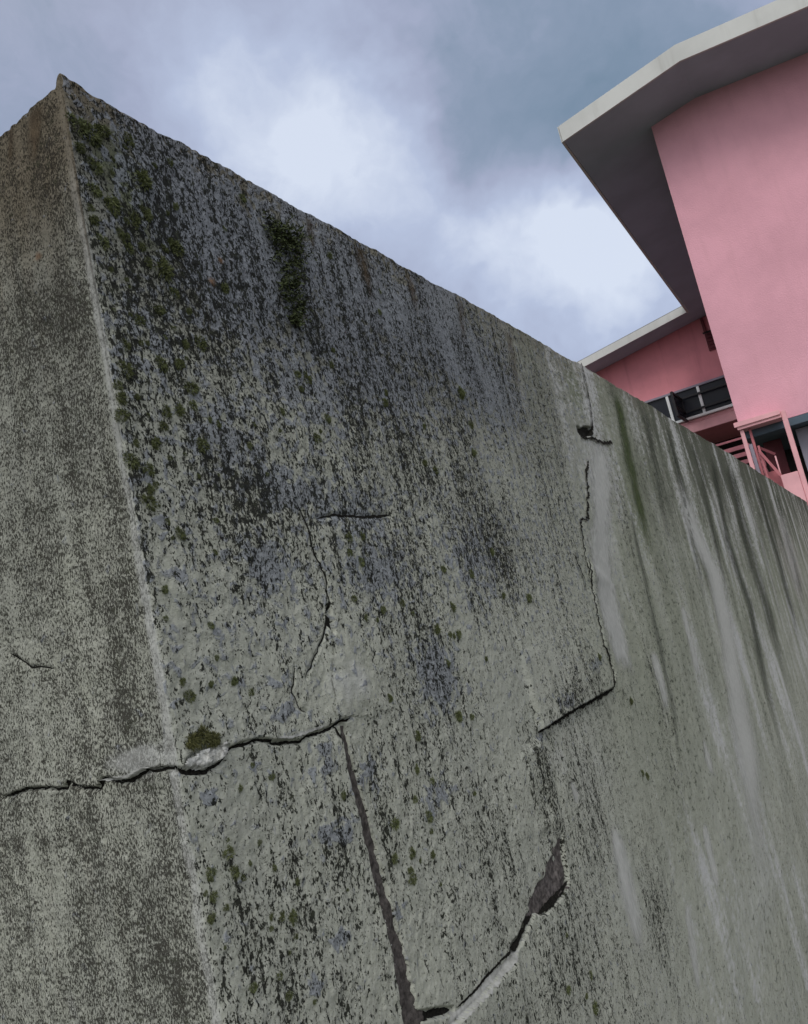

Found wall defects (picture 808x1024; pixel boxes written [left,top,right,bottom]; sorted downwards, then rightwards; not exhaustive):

leakage [615,400,646,540]
crack [6,504,449,1024]
crack [538,363,616,822]
leakage [653,647,667,704]
leakage [681,470,777,830]
spalling [448,838,570,1024]
leakage [613,832,640,939]